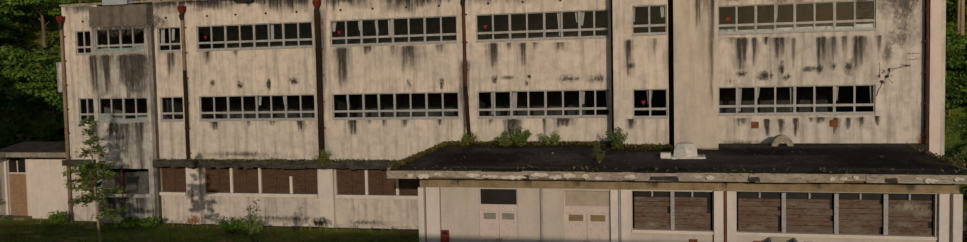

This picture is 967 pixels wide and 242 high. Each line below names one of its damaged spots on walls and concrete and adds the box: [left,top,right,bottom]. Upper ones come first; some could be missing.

water stain [89,55,146,89]
water stain [336,48,347,74]
water stain [736,37,784,76]
water stain [814,37,833,71]
water stain [854,36,866,59]
crack [875,53,920,96]
peeling [466,172,602,180]